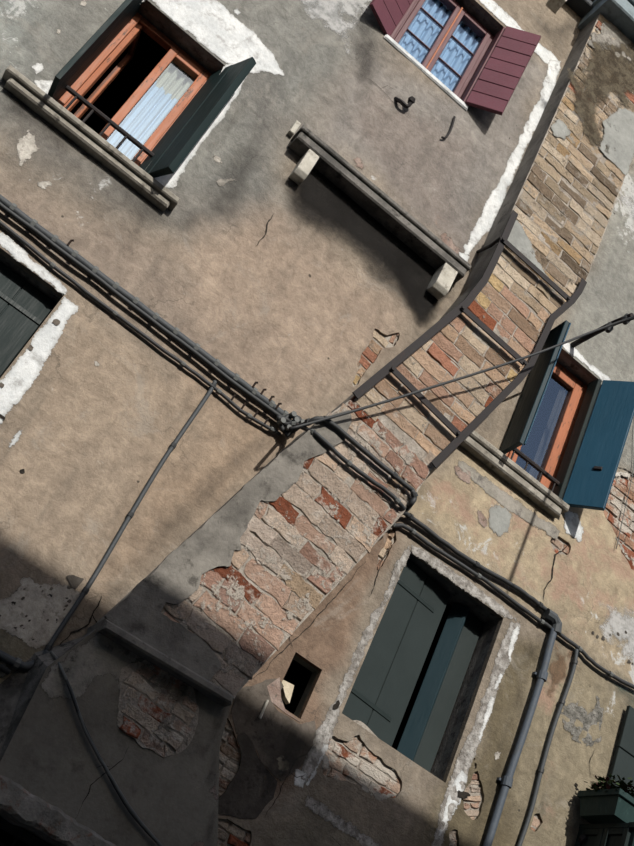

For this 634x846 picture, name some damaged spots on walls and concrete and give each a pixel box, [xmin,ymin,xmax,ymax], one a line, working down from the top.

peeling [479,0,524,31]
damp [567,41,634,152]
flaking render [161,15,634,846]
flaking render [0,577,80,649]
crack [543,544,569,599]
flaking render [117,660,199,758]